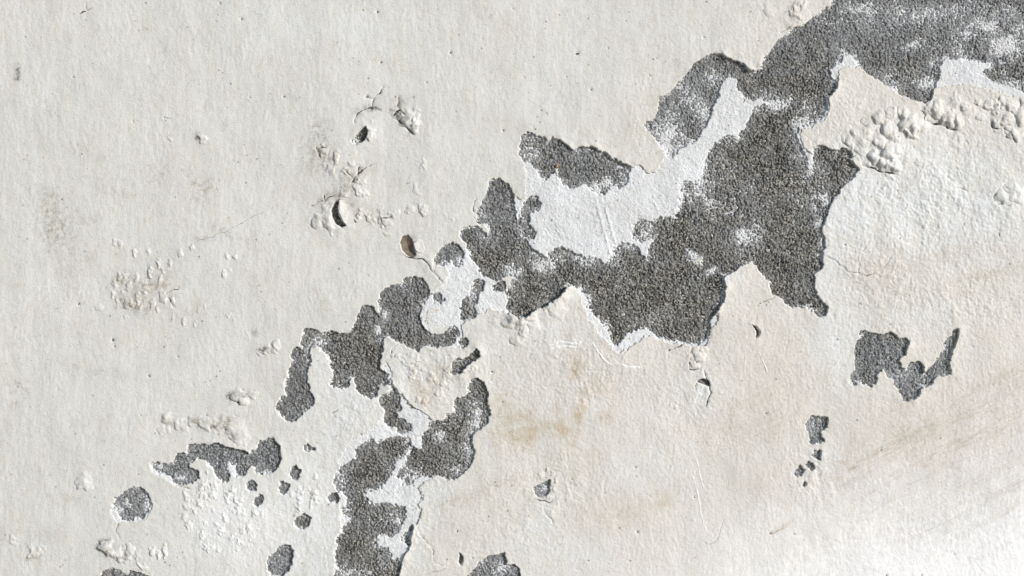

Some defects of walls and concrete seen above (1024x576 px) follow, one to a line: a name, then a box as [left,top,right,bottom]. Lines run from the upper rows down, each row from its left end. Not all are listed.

peeling [276,0,1024,576]
peeling [150,438,301,506]
peeling [110,486,153,523]
peeling [101,568,147,576]
peeling [267,545,294,576]